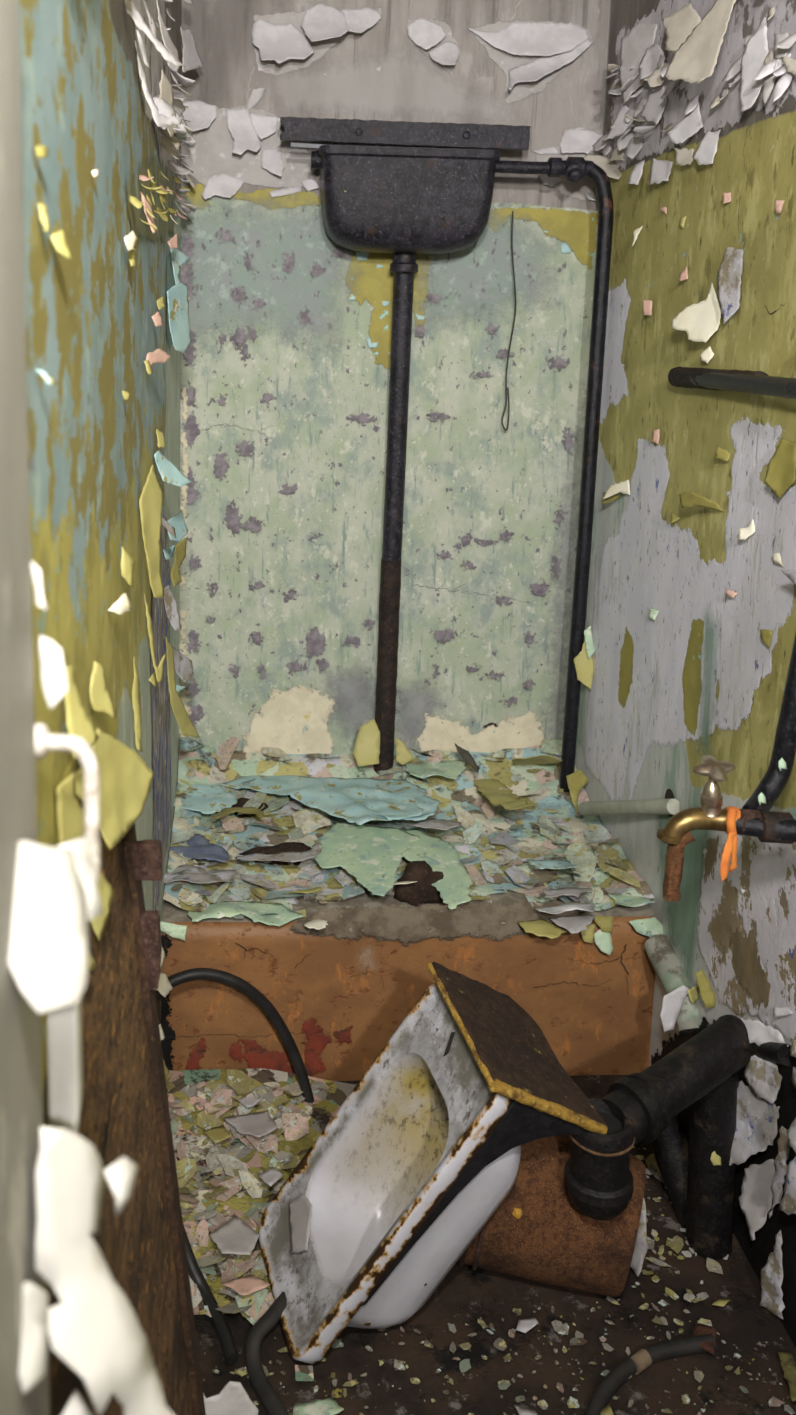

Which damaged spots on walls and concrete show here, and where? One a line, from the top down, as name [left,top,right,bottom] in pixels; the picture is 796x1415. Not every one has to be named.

peeling [407,17,593,104]
peeling [488,0,796,270]
peeling [600,278,652,425]
peeling [671,247,744,364]
peeling [9,0,394,1014]
spalling [436,529,515,572]
peeling [585,416,796,801]
spalling [416,678,544,753]
peeling [155,947,173,1040]
peeling [229,1017,353,1076]
peeling [697,835,796,1319]
peeling [19,1126,174,1415]